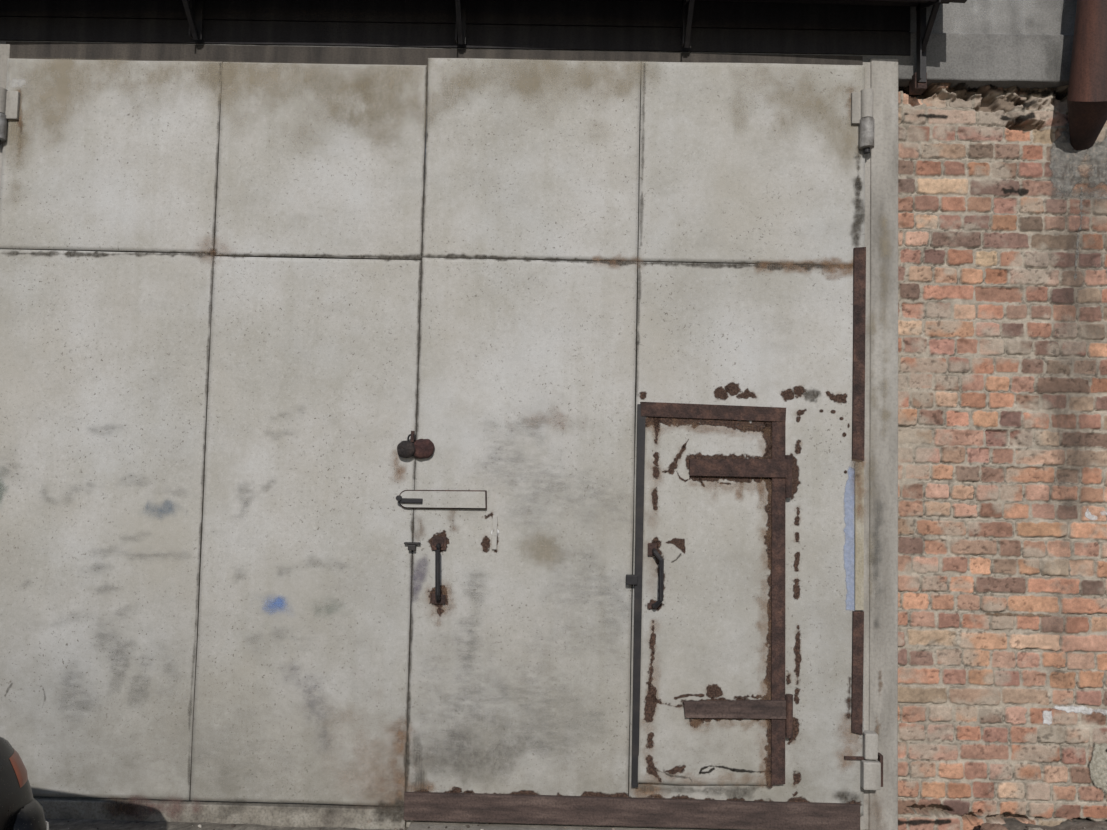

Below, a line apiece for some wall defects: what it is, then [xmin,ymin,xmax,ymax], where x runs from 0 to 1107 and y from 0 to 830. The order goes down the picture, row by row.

damp [40,60,81,124]
spalling [1001,101,1036,125]
rust [686,452,772,497]
rust [649,541,665,611]
rust [414,564,448,616]
rust [674,684,771,707]
rust [690,718,771,728]
rust [411,786,496,794]
rust [581,783,773,802]